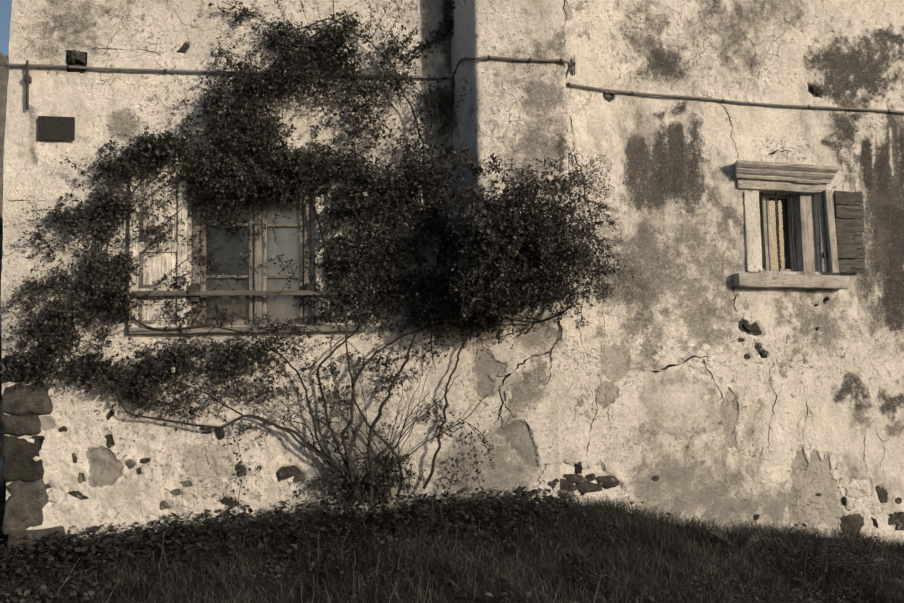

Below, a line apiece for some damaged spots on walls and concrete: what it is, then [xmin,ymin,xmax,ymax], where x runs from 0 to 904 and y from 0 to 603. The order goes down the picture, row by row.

damp [633,1,685,82]
damp [804,25,904,336]
damp [602,101,753,369]
flaking render [468,346,508,399]
crack [494,314,584,428]
crack [643,344,727,431]
spalling [737,317,768,360]
damp [834,373,904,420]
flaking render [45,434,151,503]
flaking render [496,417,629,503]
flaking render [788,445,904,538]